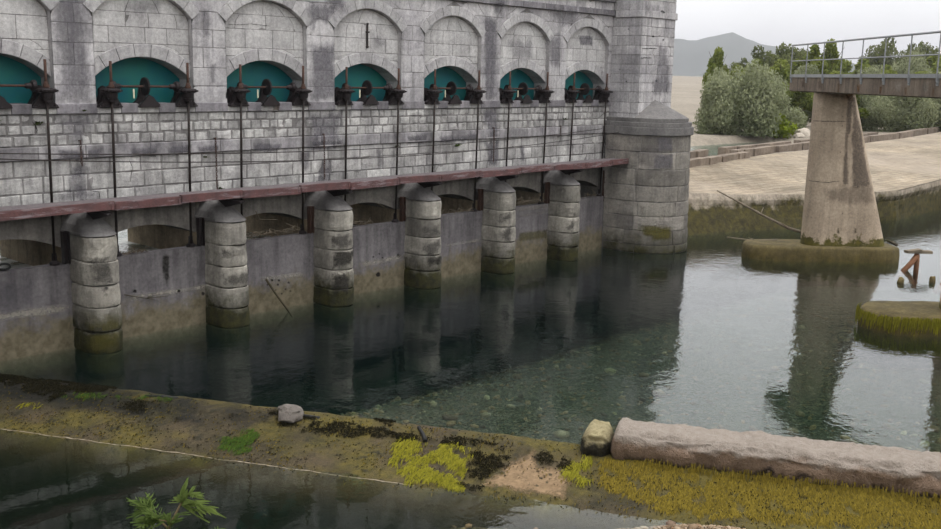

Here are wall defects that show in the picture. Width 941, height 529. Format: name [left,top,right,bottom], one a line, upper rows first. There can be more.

damp [843,98,869,187]